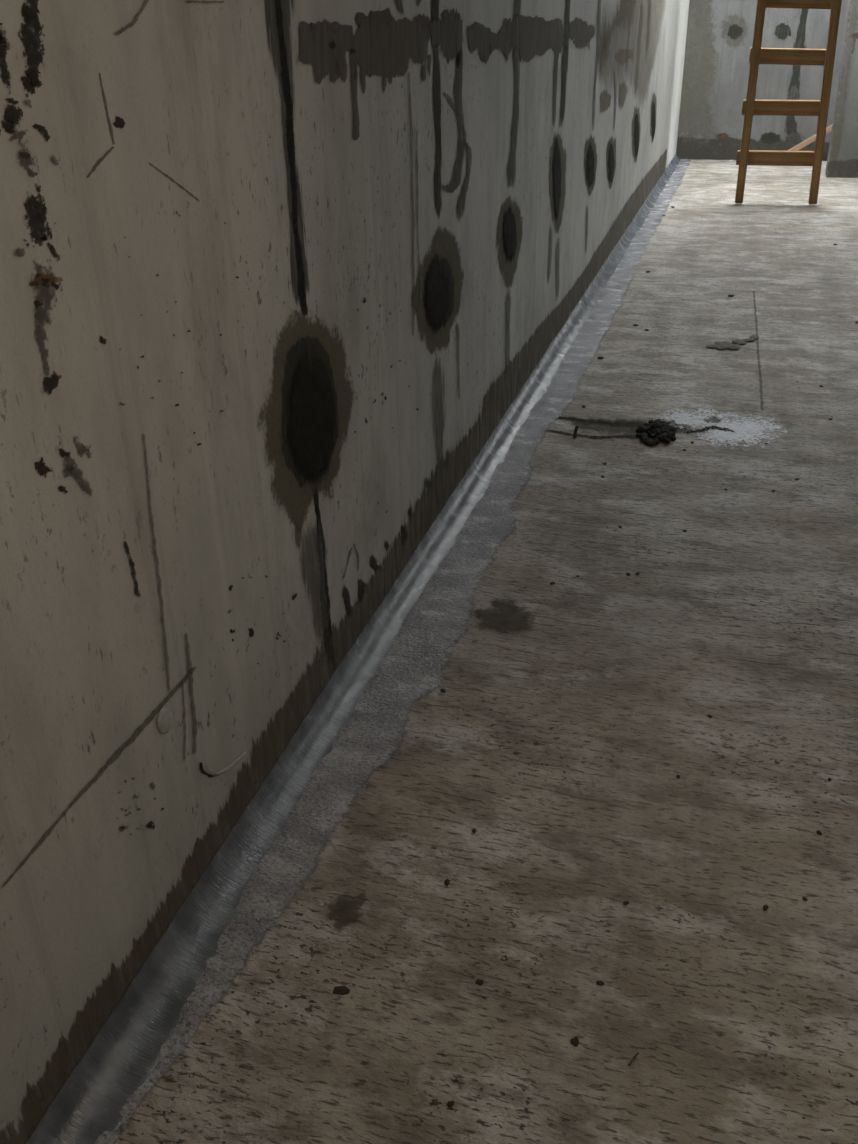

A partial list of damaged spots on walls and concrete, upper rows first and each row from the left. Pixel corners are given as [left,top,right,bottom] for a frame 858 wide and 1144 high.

crack [264,0,309,315]
water stain [676,0,858,178]
water stain [653,404,787,450]
crack [295,488,335,660]
water stain [0,0,667,1144]